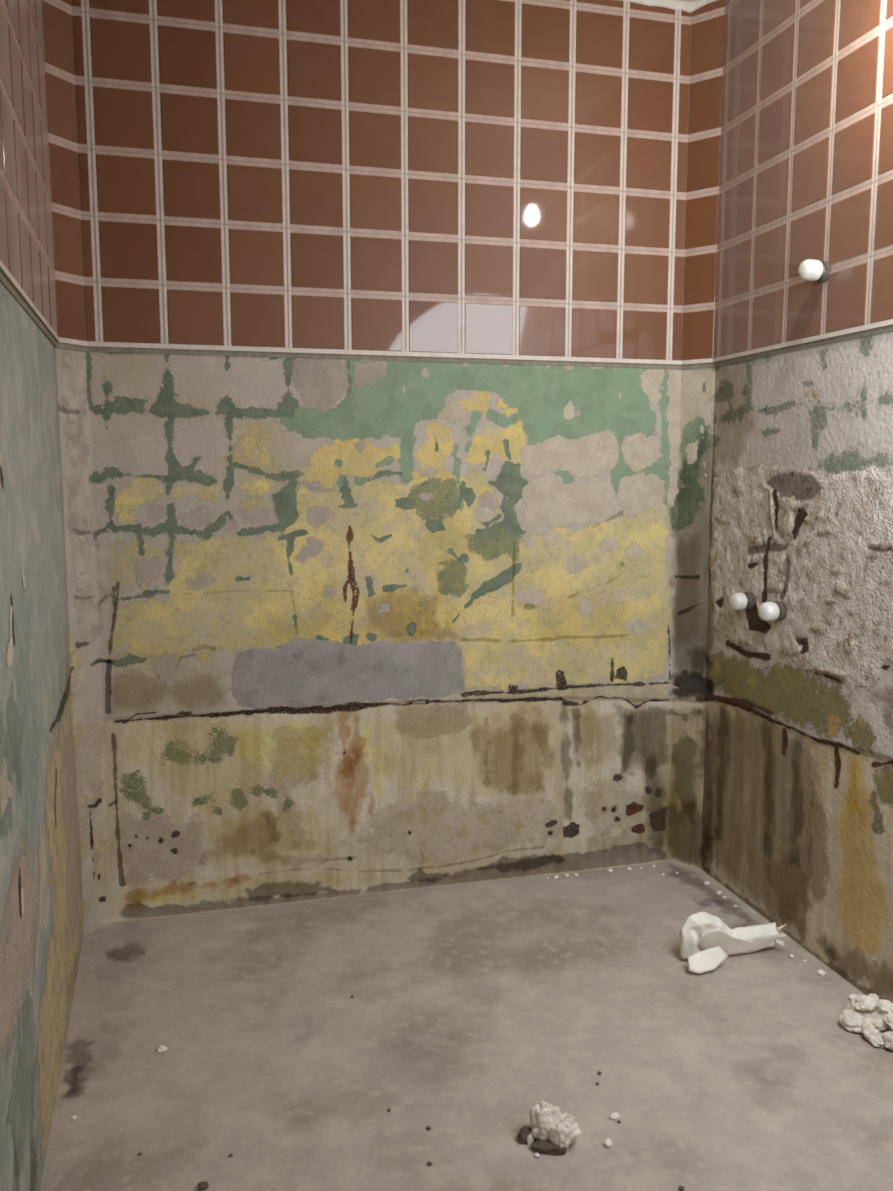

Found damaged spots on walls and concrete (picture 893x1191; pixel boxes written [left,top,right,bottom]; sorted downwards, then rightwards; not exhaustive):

peeling [858,336,875,358]
peeling [89,354,893,835]
crack [111,619,893,788]
peeling [0,571,47,1176]
spalling [77,711,297,902]
damp [256,716,652,873]
spalling [545,820,581,838]
spalling [517,1126,534,1146]